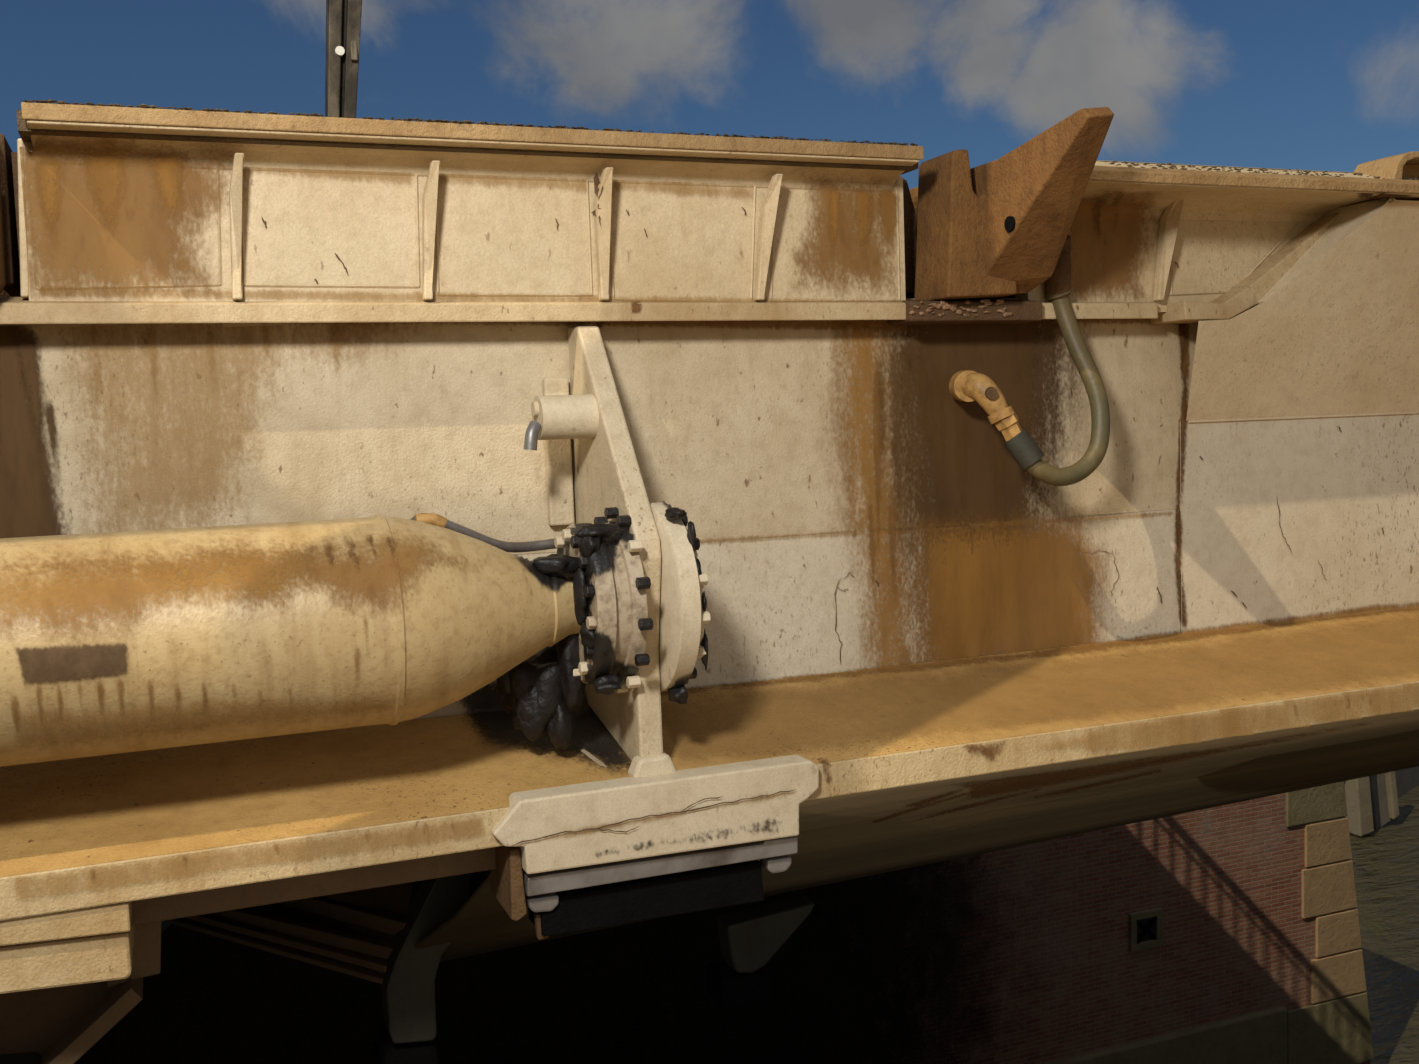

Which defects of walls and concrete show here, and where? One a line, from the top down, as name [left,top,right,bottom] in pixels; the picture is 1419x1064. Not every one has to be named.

rust [19,137,233,292]
rust [796,178,897,289]
rust [1068,191,1156,300]
rust [1359,192,1408,202]
rust [376,299,1419,691]
crack [513,789,796,846]